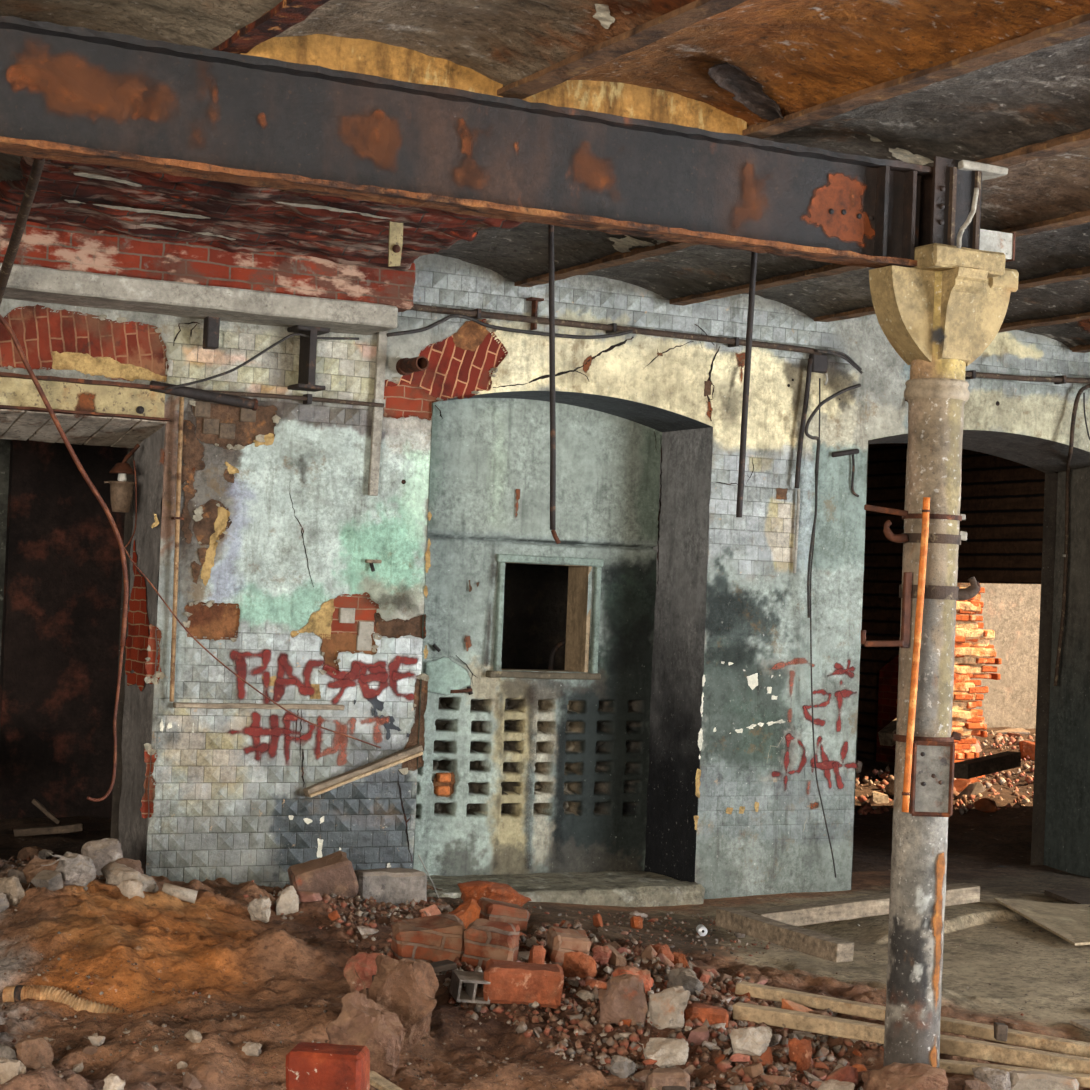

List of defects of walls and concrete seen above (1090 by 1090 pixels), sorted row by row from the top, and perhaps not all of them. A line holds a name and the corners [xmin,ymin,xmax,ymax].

corrosion [7,51,173,119]
spalling [0,156,523,271]
corrosion [575,149,613,189]
corrosion [801,173,875,247]
flaking render [0,304,169,382]
flaking render [383,319,508,420]
crack [493,337,634,388]
crack [645,324,720,421]
peeling [176,400,281,586]
crack [289,493,314,587]
flaking render [290,592,428,699]
corrosion [932,852,945,1007]